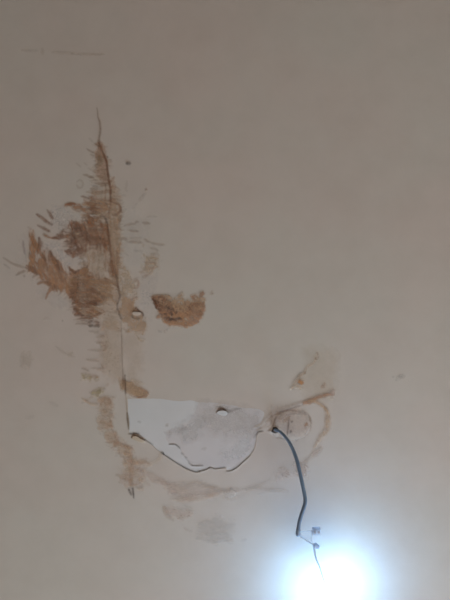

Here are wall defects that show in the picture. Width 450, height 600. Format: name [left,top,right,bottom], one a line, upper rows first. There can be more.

damp [29,193,146,332]
damp [121,380,147,398]
peeling [128,398,264,475]